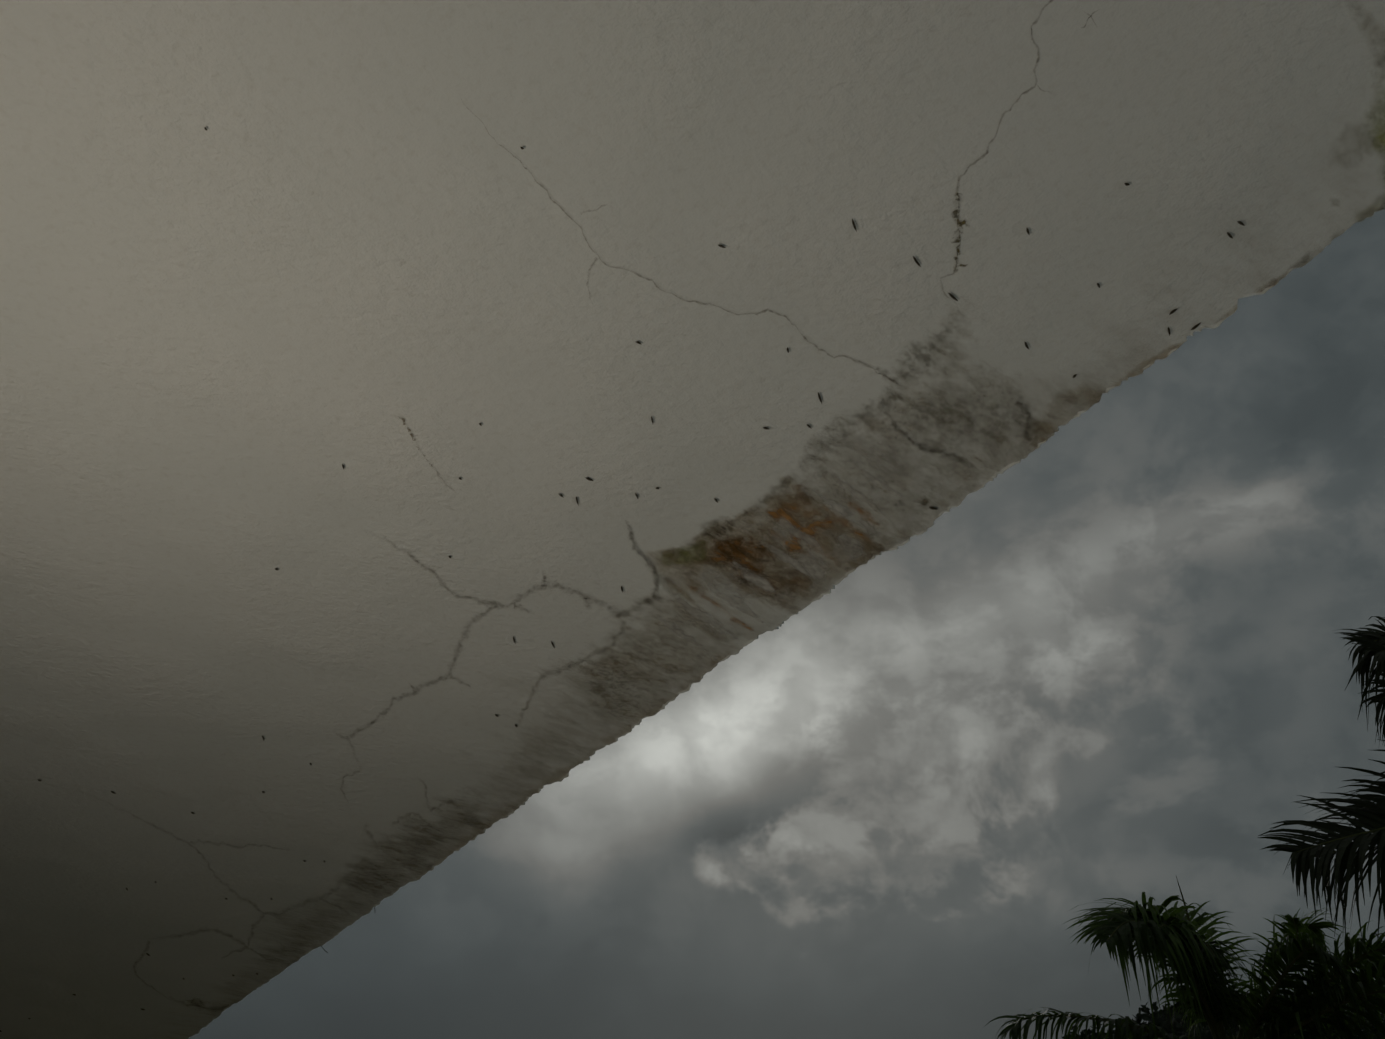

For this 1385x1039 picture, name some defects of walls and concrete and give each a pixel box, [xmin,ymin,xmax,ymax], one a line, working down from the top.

crack [953,193,966,267]
rust [675,471,899,632]